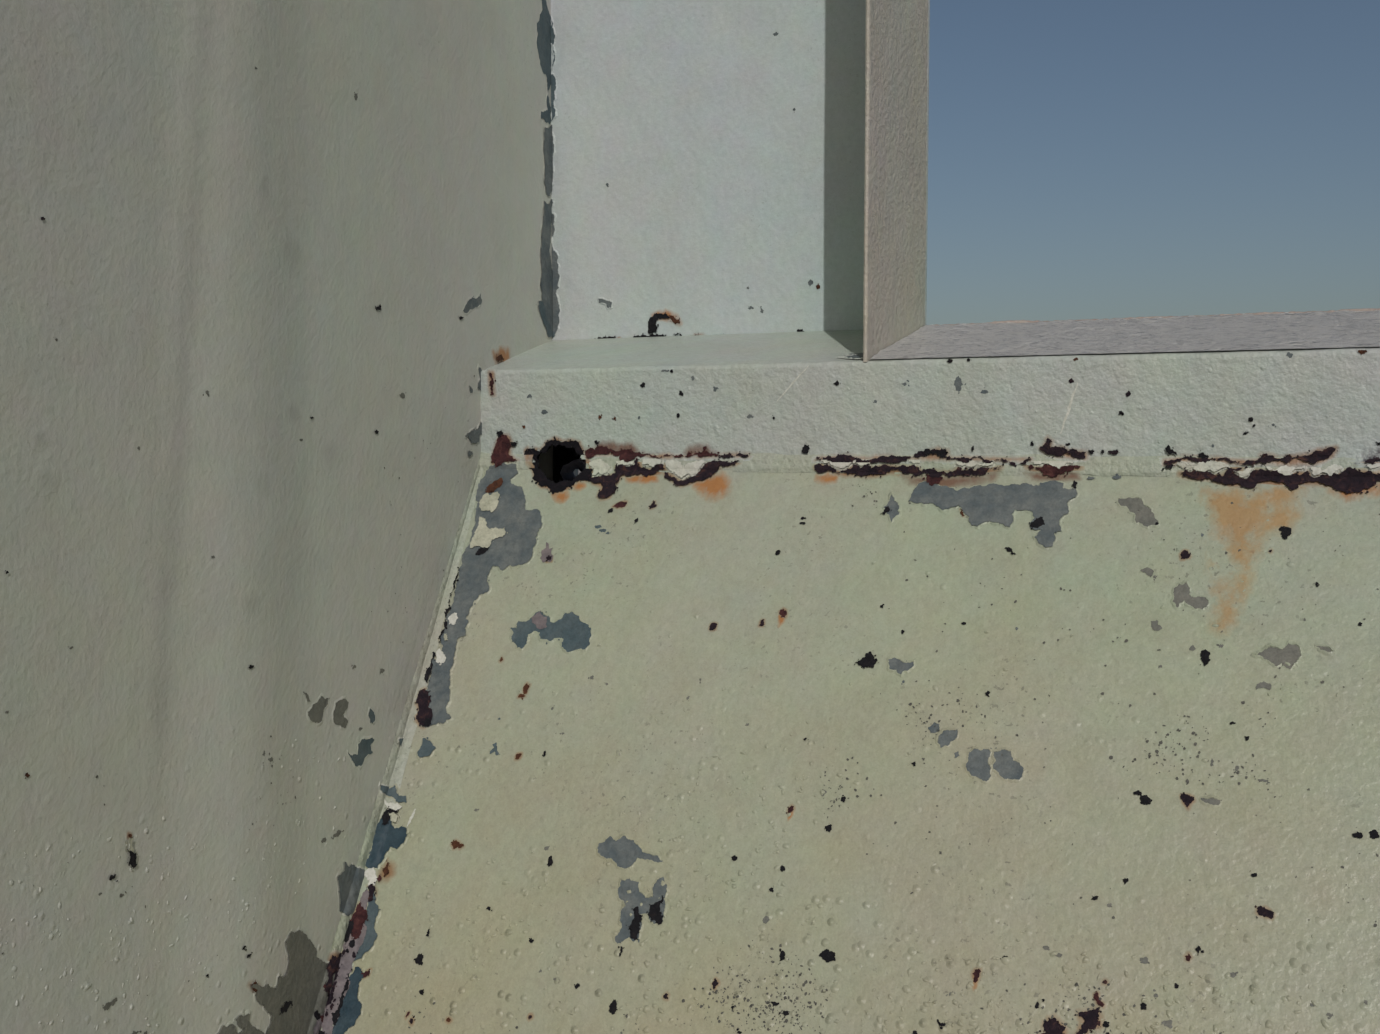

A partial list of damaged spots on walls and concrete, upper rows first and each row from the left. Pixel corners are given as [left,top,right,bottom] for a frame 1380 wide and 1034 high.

rust [648,306,685,334]
rust [490,414,755,522]
rust [801,432,1120,491]
peeling [882,476,1094,550]
peeling [1115,495,1161,529]
rust [1159,441,1380,666]
peeling [398,462,555,760]
peeling [509,610,594,654]
peeling [302,690,376,769]
peeling [928,722,1025,784]
peeling [215,781,410,1034]
peeling [596,833,671,956]